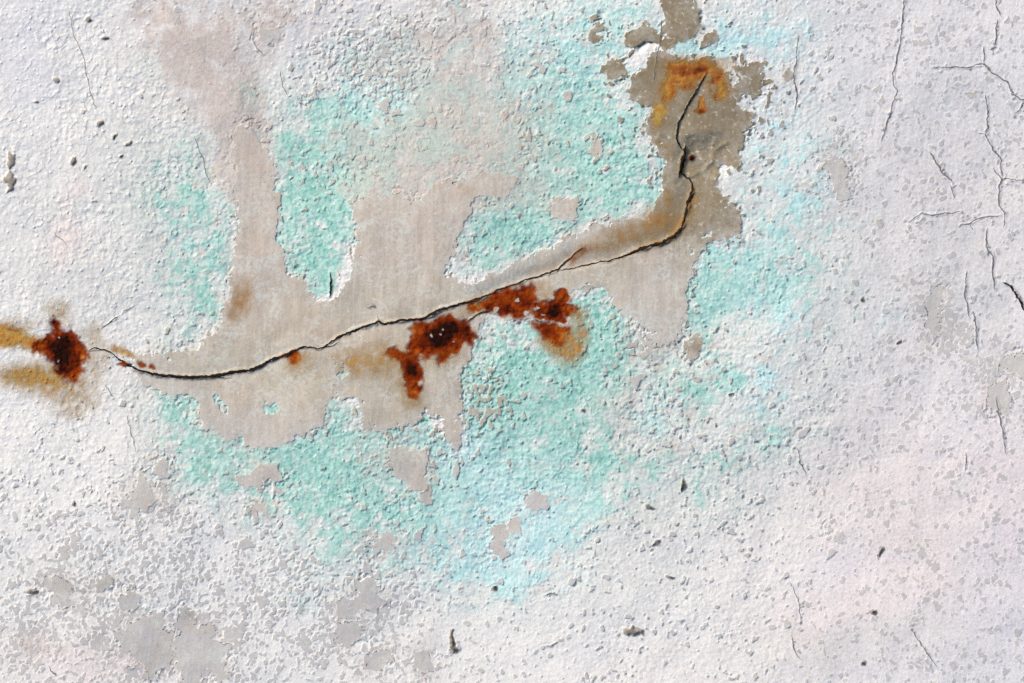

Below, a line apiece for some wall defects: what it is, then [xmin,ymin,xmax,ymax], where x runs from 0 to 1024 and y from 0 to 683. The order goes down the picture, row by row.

corrosion [653,59,728,126]
crack [91,76,705,379]
flaking render [123,0,767,516]
crack [912,0,1024,346]
corrosion [0,314,90,401]
corrosion [112,346,155,370]
corrosion [345,283,587,404]